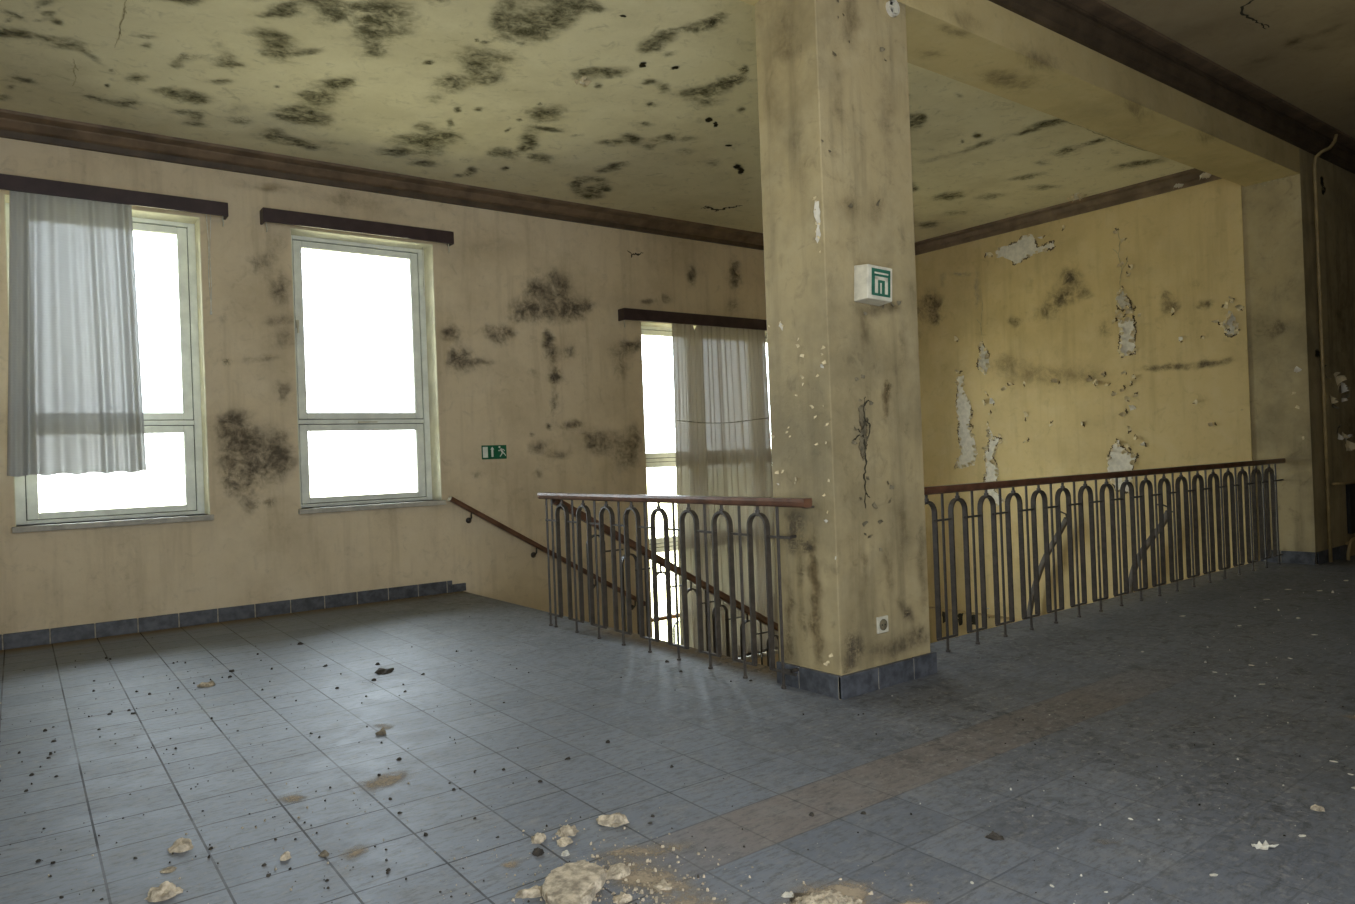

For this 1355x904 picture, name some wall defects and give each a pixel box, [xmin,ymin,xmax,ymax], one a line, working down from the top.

damp [259,0,404,57]
damp [493,0,603,39]
crack [1240,0,1269,29]
damp [265,78,354,149]
damp [383,108,460,166]
damp [491,103,559,169]
peeling [984,225,1065,266]
damp [516,272,591,382]
peeling [1086,258,1147,494]
damp [219,412,290,489]
crack [853,397,871,508]
peeling [954,341,1026,507]